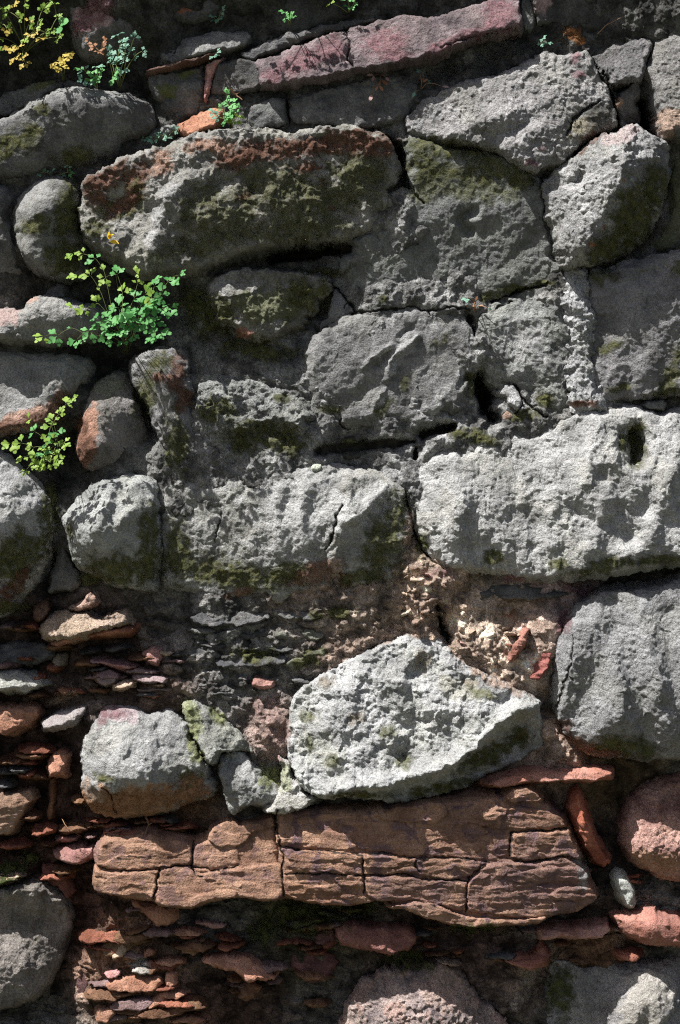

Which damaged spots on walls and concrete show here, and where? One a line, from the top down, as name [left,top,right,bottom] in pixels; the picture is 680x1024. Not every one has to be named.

crack [328,505,343,547]